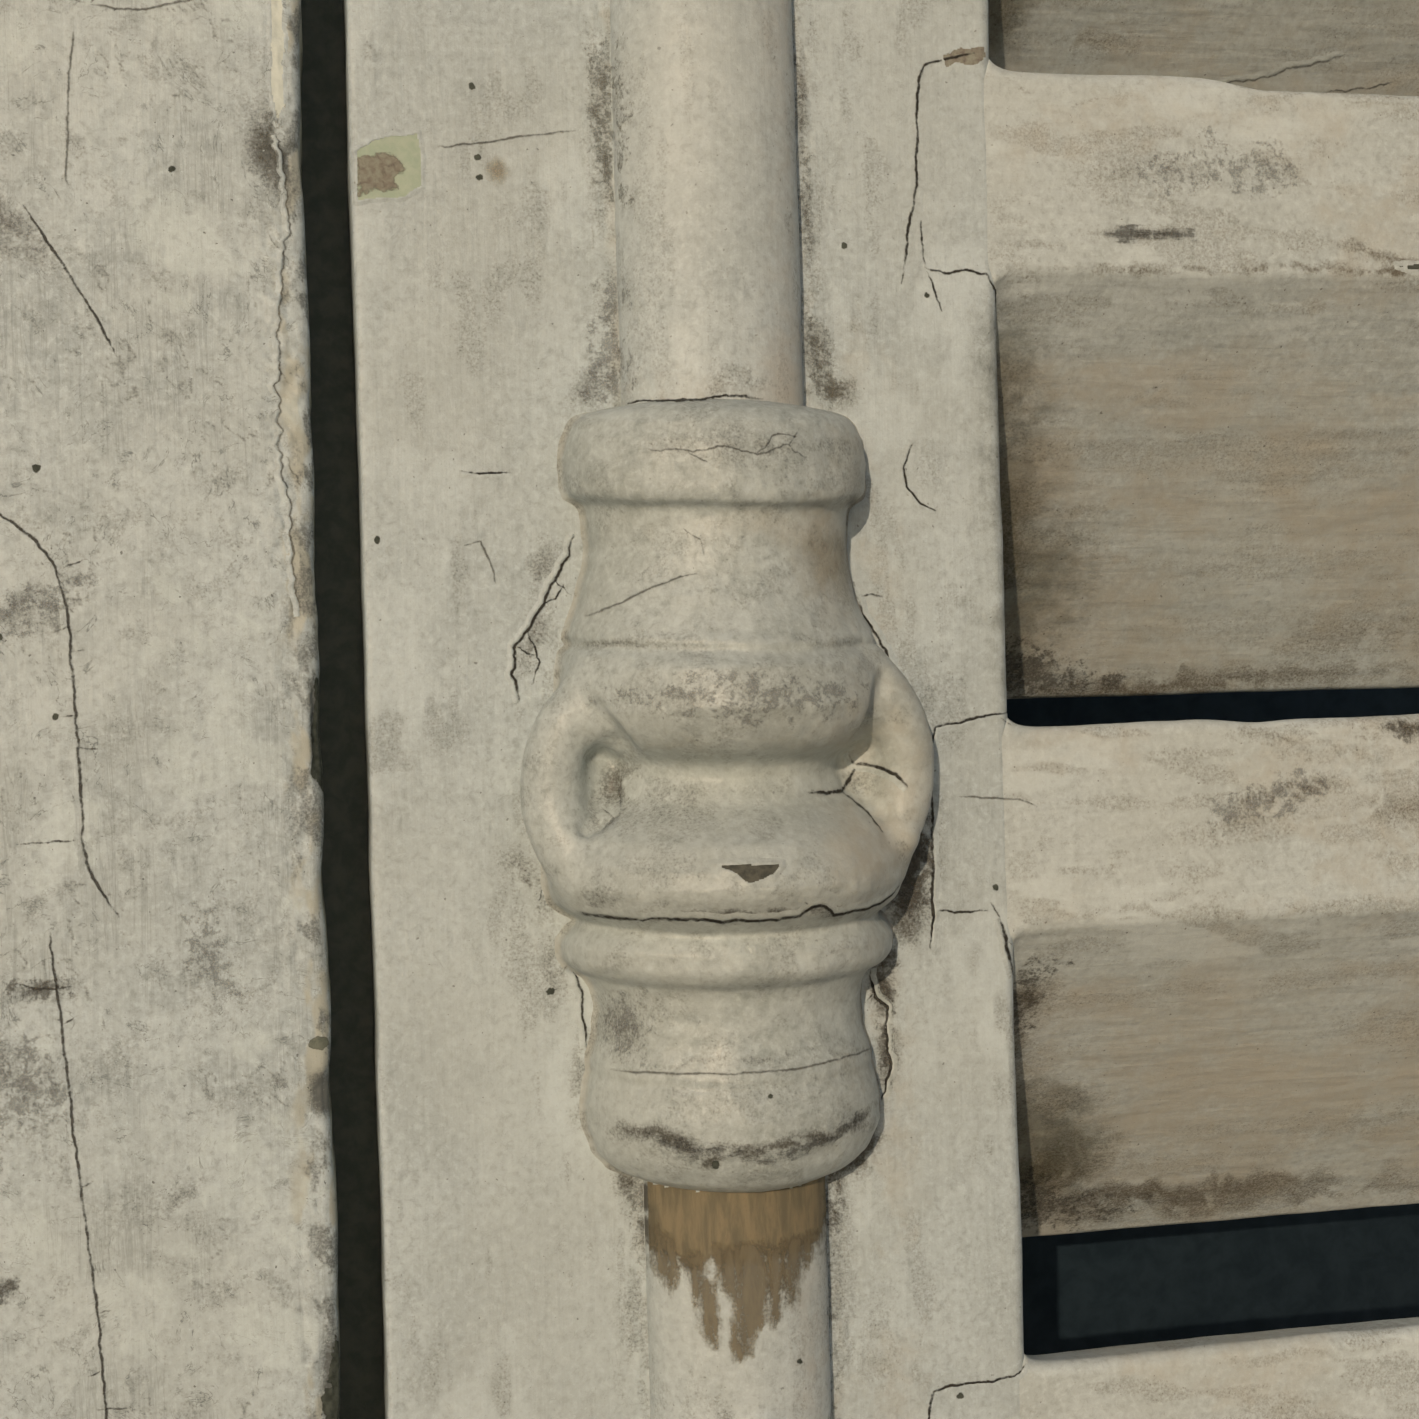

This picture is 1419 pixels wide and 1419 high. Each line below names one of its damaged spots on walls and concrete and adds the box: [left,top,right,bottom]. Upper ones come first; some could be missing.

peeling [351,129,426,206]
crack [902,53,996,311]
crack [0,514,119,922]
crack [504,533,574,704]
water stain [1005,640,1121,698]
peeling [706,857,788,891]
crack [581,712,1029,979]
water stain [1013,957,1073,1038]
crack [20,931,125,1419]
rust [647,1176,826,1361]
water stain [1020,1167,1149,1228]
crack [928,1364,1030,1419]